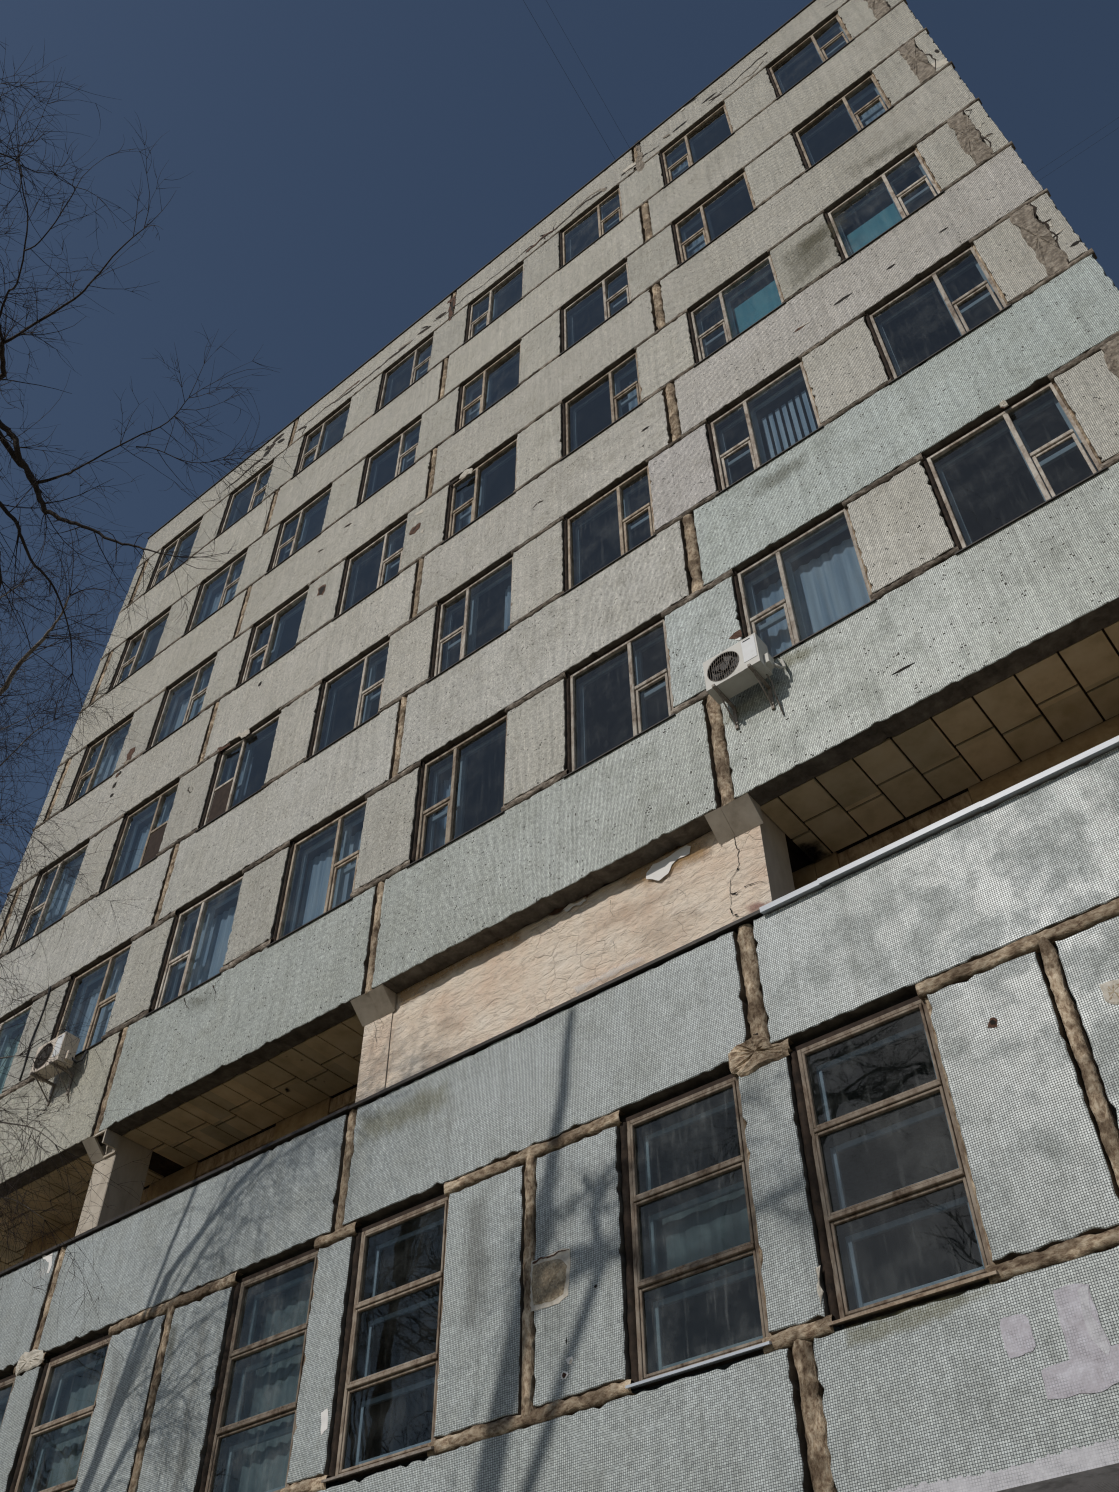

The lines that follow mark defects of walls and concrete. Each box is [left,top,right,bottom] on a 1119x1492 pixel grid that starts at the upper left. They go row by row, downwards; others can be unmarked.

spalling [898,38,948,84]
spalling [947,109,993,165]
peeling [646,845,691,881]
crack [581,837,763,957]
spalling [530,1248,571,1312]